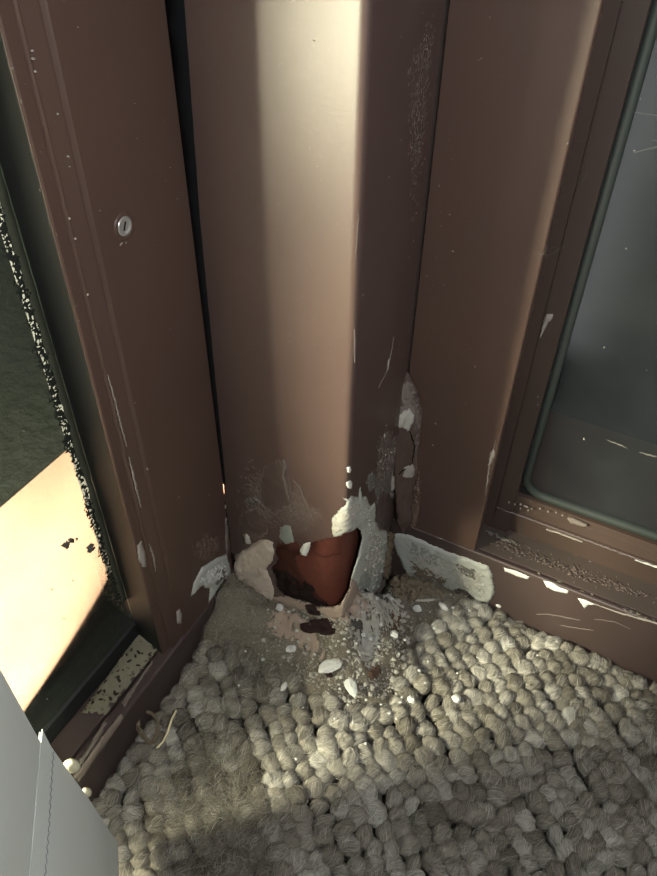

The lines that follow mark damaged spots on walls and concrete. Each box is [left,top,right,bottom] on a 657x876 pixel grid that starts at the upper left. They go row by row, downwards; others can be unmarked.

crack [399,431,415,475]
peeling [137,541,147,567]
peeling [191,505,231,603]
peeling [279,525,311,556]
peeling [332,464,501,608]
peeling [504,568,529,580]
spalling [413,598,448,612]